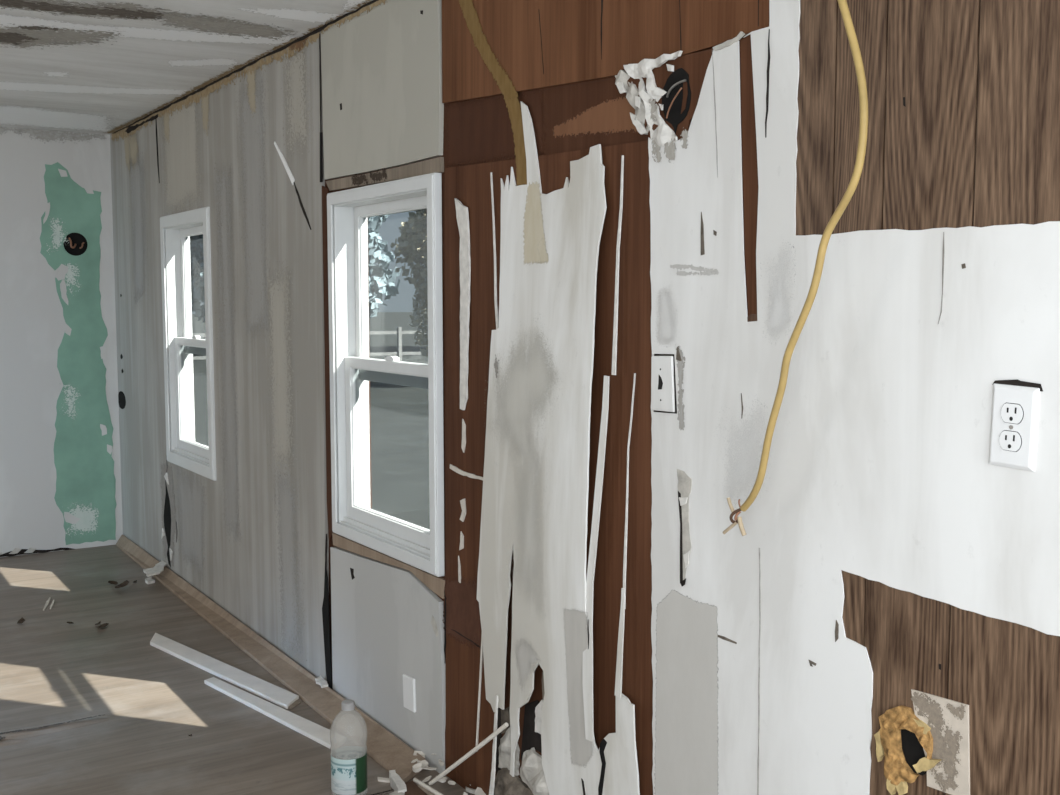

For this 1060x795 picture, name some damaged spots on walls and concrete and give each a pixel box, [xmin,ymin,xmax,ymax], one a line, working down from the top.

peeling [40,162,126,545]
leakage [0,0,387,661]
flaking render [494,700,549,795]